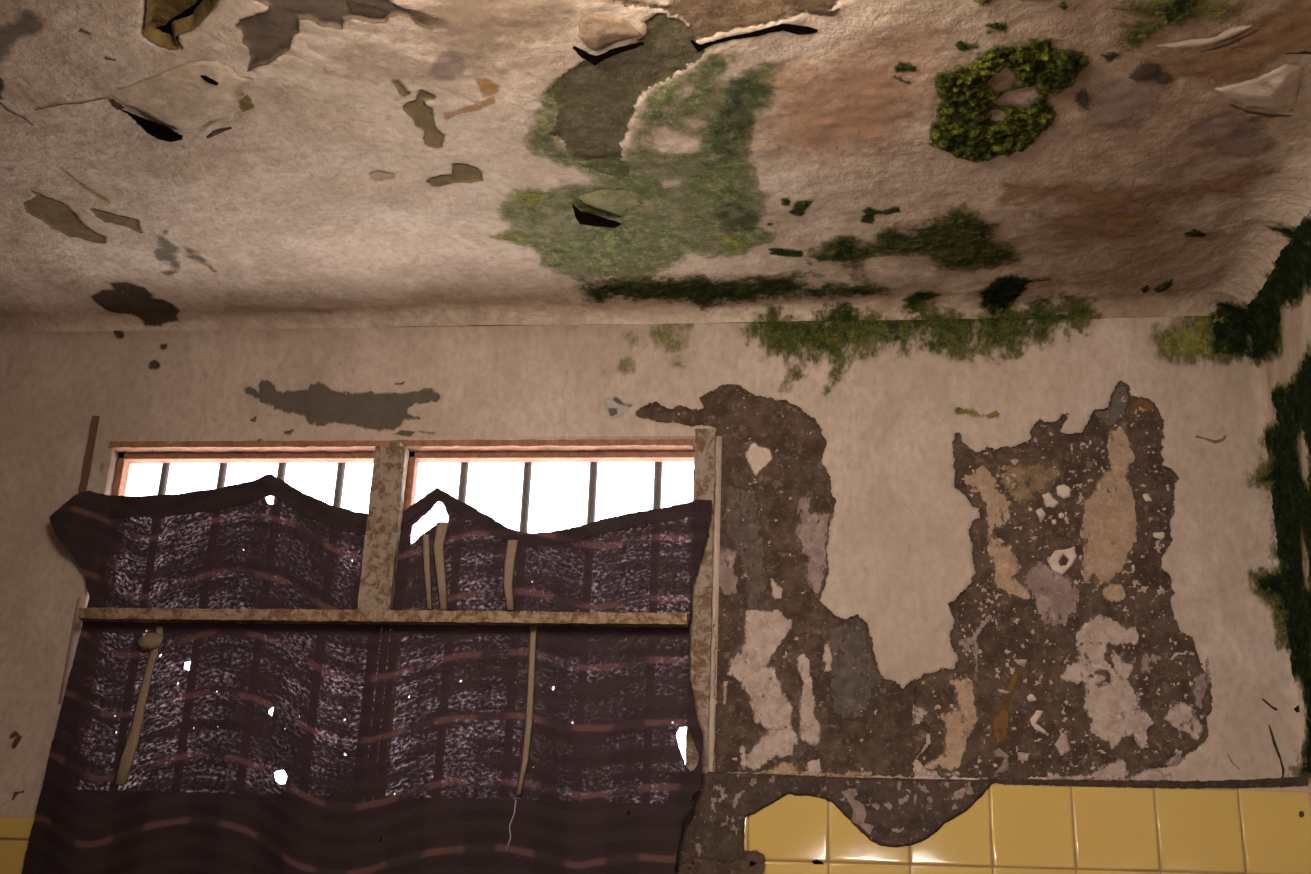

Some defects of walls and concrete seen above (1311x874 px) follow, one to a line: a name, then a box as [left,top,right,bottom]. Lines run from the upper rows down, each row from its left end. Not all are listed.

flaking render [142,0,218,49]
peeling [236,0,453,72]
peeling [392,81,446,148]
flaking render [548,0,840,228]
leakage [703,72,771,153]
peeling [369,171,395,181]
peeling [426,164,483,187]
peeling [23,190,143,244]
flaking render [636,380,1213,835]